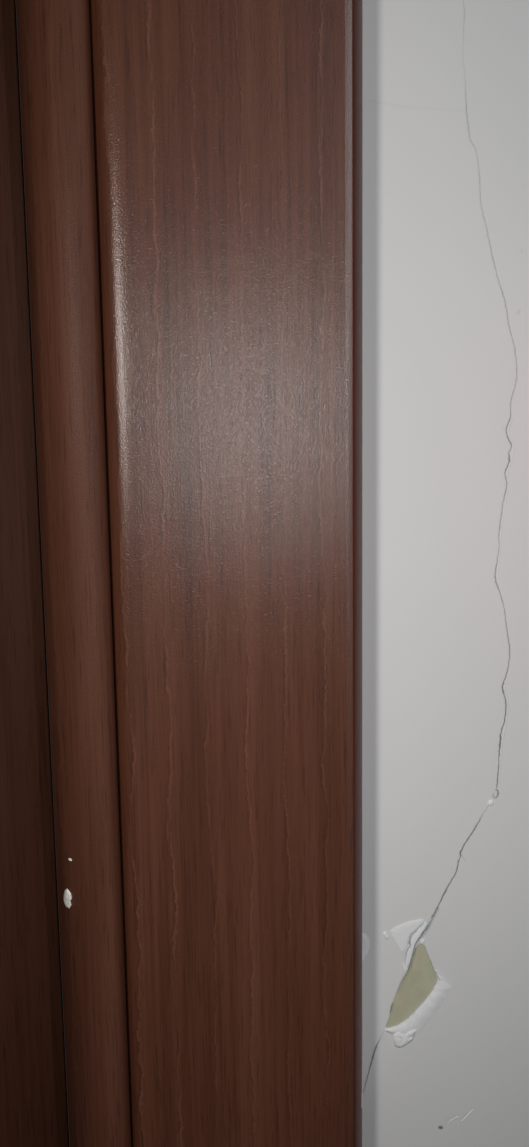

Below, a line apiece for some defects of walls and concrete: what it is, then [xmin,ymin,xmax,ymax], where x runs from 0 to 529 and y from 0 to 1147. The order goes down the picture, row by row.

crack [433,677,509,915]
peeling [383,915,451,1048]